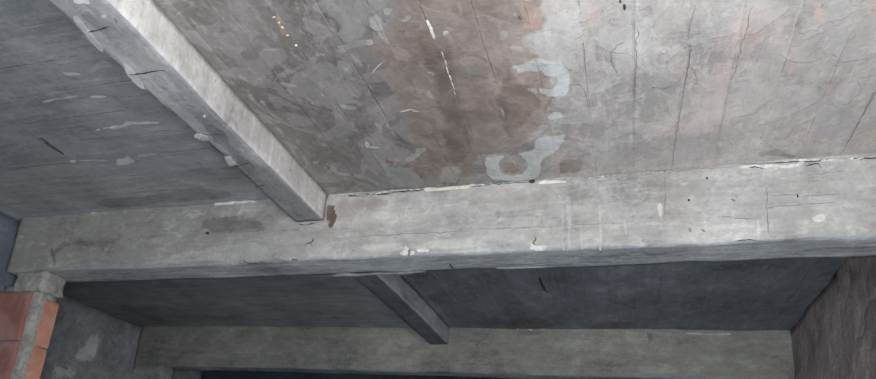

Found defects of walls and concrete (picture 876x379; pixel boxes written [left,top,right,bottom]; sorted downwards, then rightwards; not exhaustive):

peeling [497,29,573,99]
crack [33,137,64,155]
leakage [355,0,584,250]
peeling [347,111,684,197]
crack [562,0,726,217]
crack [719,91,876,255]
rust [325,204,338,229]
crack [497,262,552,292]